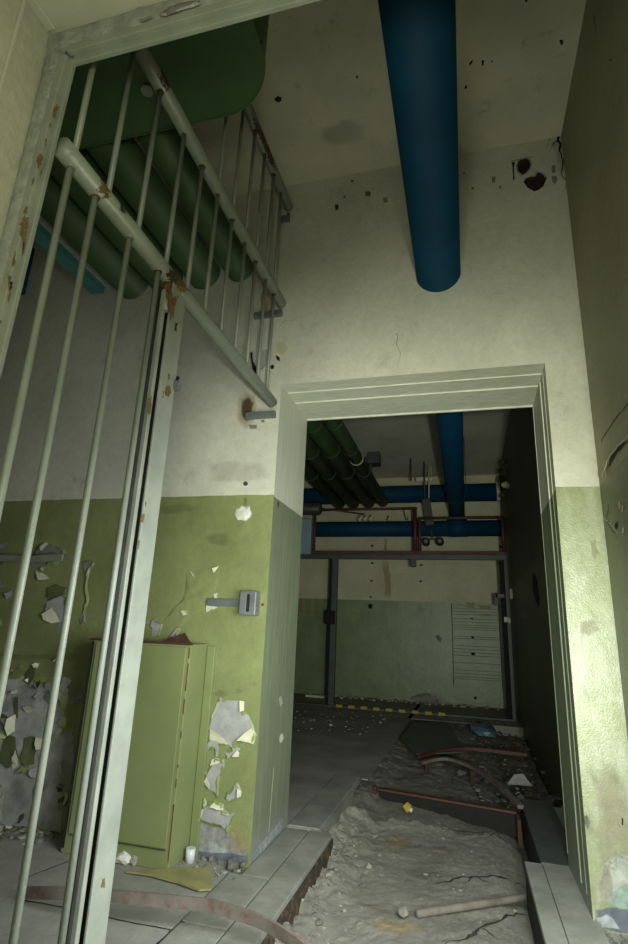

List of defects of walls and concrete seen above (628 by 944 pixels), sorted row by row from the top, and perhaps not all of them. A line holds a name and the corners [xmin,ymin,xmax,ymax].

crack [547,136,566,189]
rust [8,207,29,299]
rust [166,266,188,331]
rust [242,398,253,420]
peeling [602,435,628,476]
peeling [79,560,95,625]
peeling [0,663,83,834]
peeling [198,698,257,834]
crack [436,875,520,884]
crack [445,912,525,944]